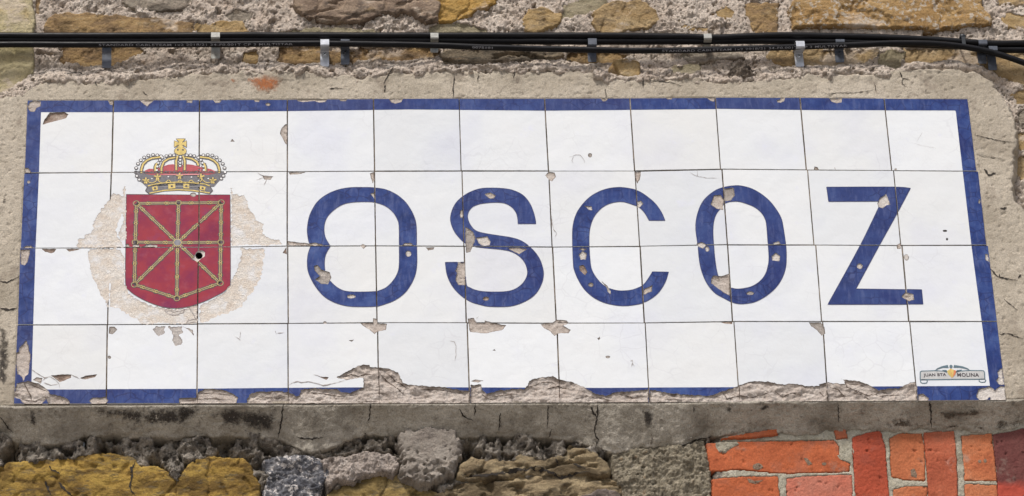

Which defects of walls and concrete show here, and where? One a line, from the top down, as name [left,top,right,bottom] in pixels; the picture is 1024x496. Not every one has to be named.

peeling [468,318,506,333]
peeling [541,320,570,336]
peeling [809,322,825,336]
spalling [14,341,97,404]
spalling [179,364,929,404]
peeling [976,368,1006,400]
crack [461,407,588,479]
crack [591,405,599,446]